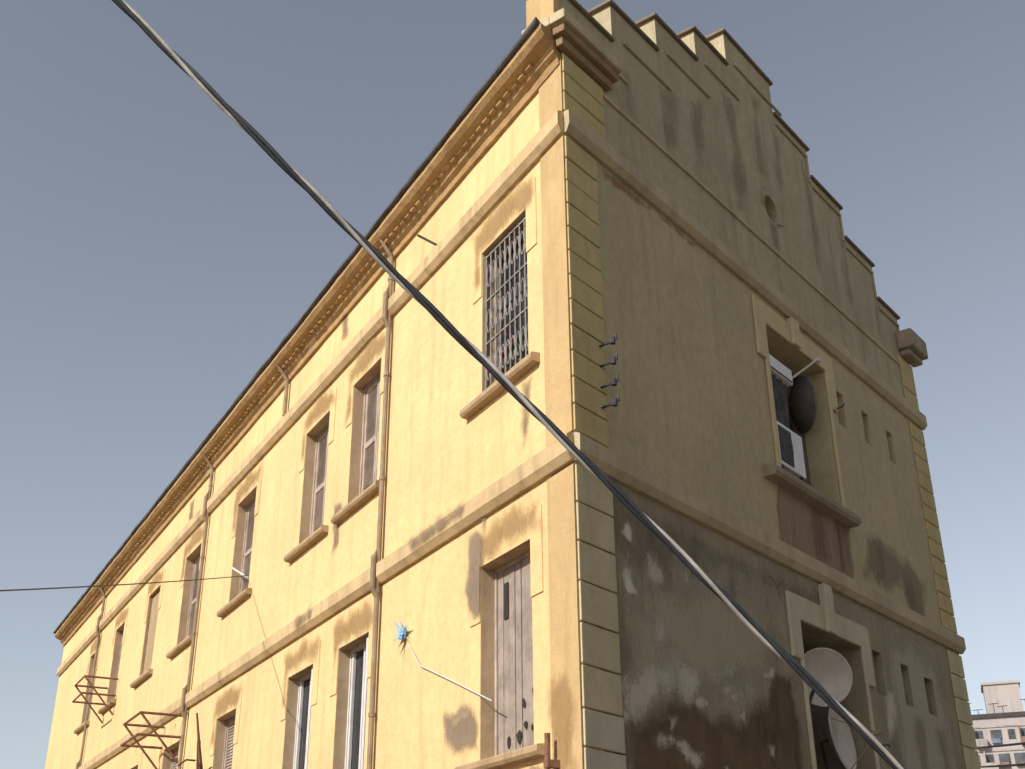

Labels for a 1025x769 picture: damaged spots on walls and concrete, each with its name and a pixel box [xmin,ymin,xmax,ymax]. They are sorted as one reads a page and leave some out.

leakage [409,504,461,548]
leakage [613,498,734,576]
leakage [777,486,853,577]
peeling [622,568,637,594]
leakage [868,540,924,615]
peeling [657,718,702,768]
leakage [619,676,801,769]
leakage [885,689,899,749]